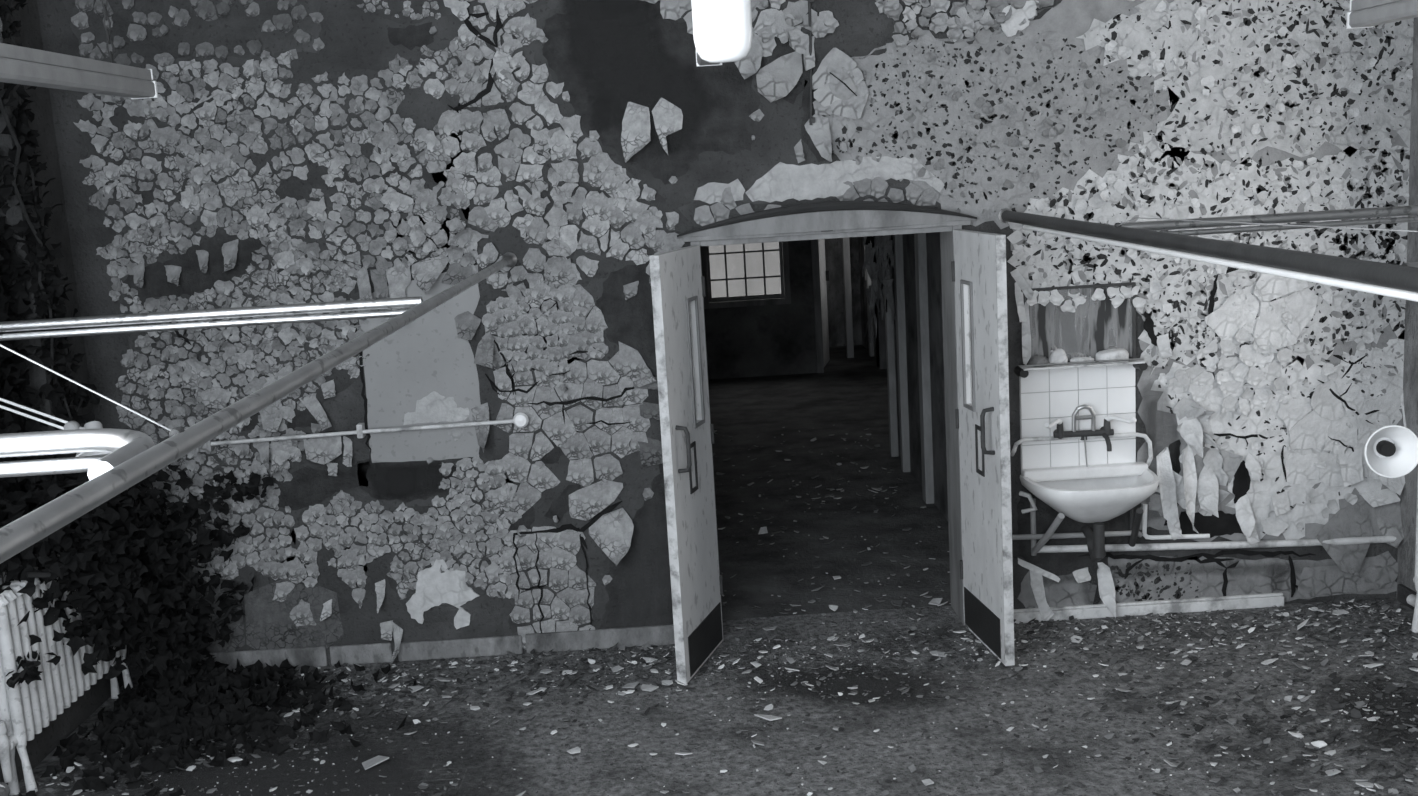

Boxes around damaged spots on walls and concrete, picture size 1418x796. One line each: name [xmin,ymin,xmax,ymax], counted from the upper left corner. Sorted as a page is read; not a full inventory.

crack [448,0,503,143]
peeling [63,0,1414,665]